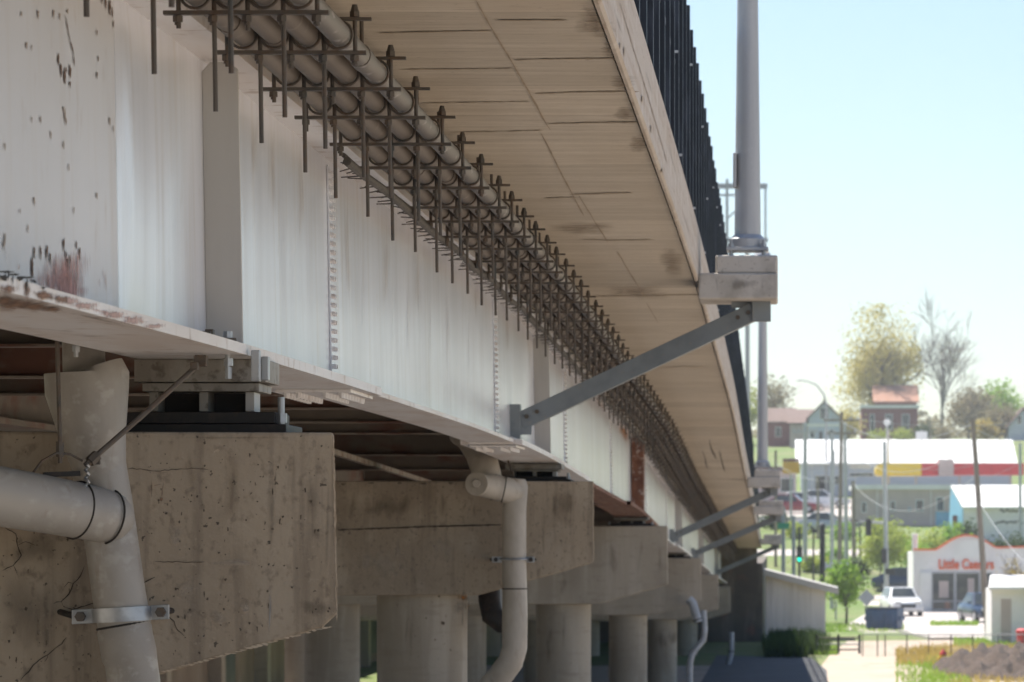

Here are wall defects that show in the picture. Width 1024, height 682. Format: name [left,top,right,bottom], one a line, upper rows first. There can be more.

rust [0,257,160,329]
crack [4,528,34,575]
crack [56,568,93,610]